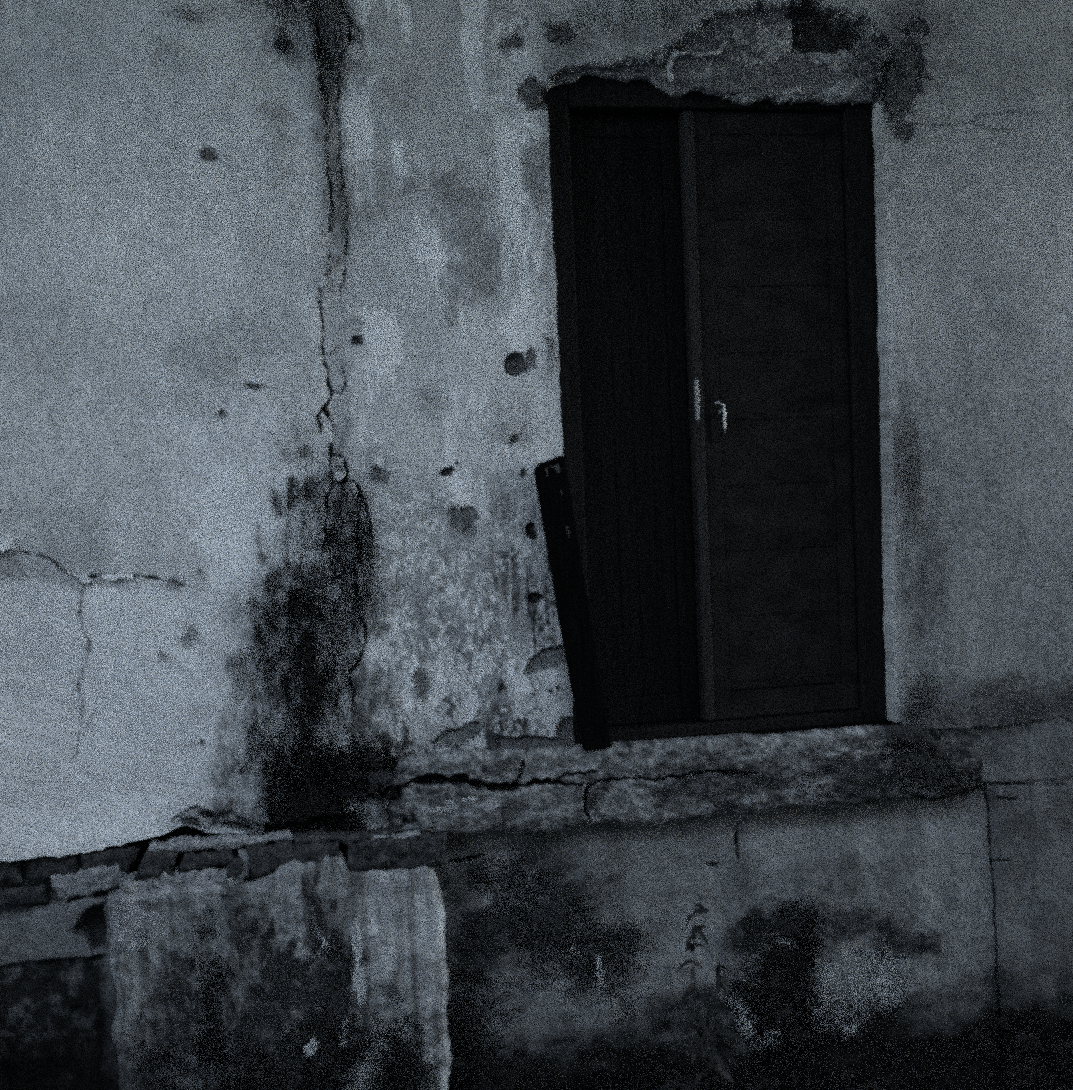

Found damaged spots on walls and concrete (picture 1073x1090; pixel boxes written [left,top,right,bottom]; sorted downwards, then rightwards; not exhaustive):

spalling [519,0,929,142]
crack [312,0,370,577]
crack [28,553,96,715]
water stain [212,475,406,835]
crack [337,622,366,697]
peeling [525,646,567,674]
spalling [0,807,447,906]
peeling [496,718,574,749]
water stain [449,846,632,988]
crack [407,762,716,817]
water stain [296,985,435,1090]
water stain [438,903,1073,1090]